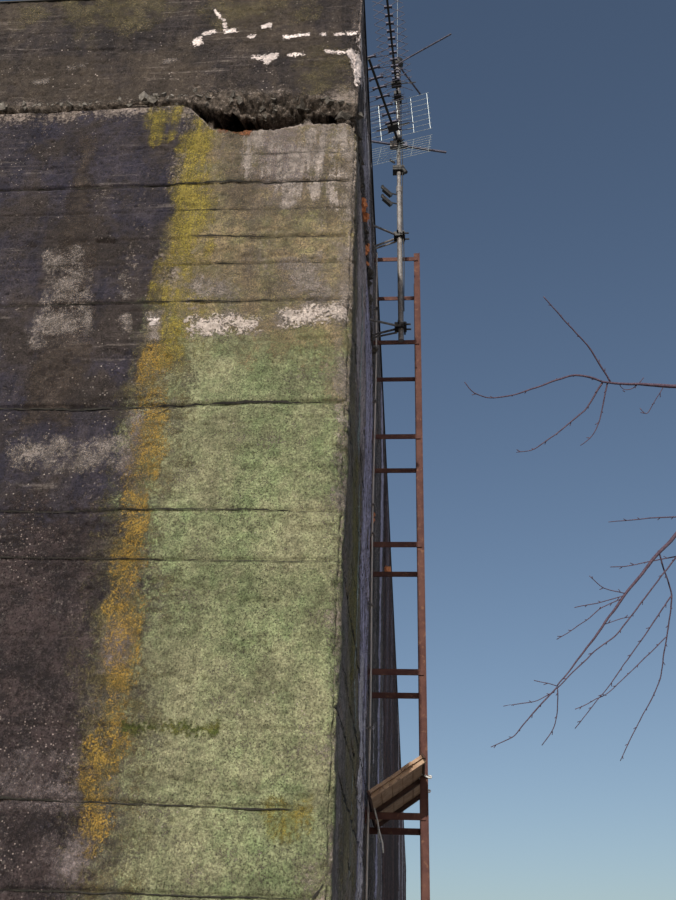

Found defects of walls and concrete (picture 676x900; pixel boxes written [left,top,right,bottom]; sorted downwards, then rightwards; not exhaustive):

water stain [192,9,236,47]
spalling [194,90,357,133]
water stain [242,31,372,266]
water stain [0,106,205,900]
water stain [355,276,400,900]